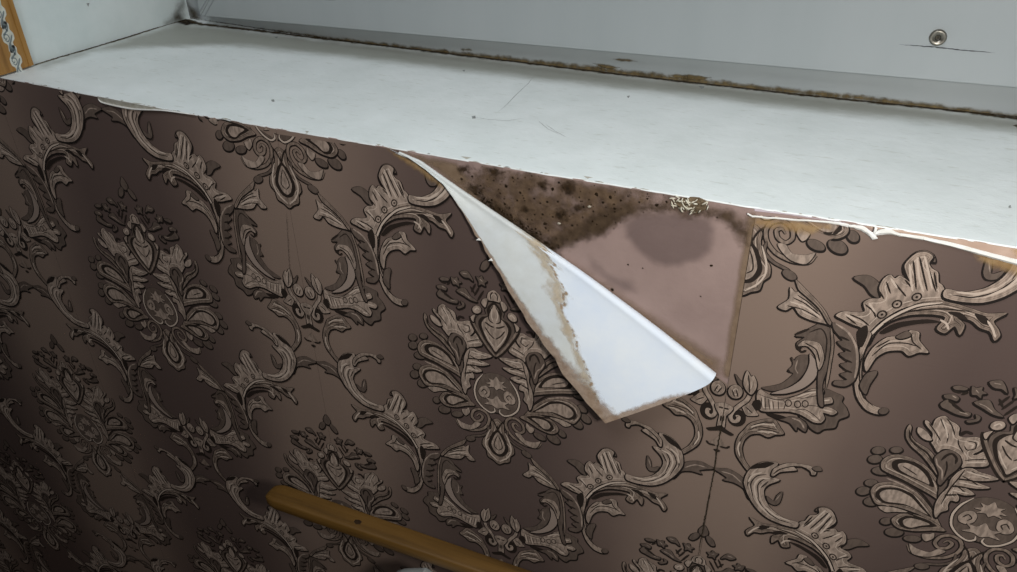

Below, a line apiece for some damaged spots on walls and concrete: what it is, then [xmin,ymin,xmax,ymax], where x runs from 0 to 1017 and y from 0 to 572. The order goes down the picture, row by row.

water stain [399,155,684,423]
spalling [669,195,709,215]
water stain [626,209,755,377]